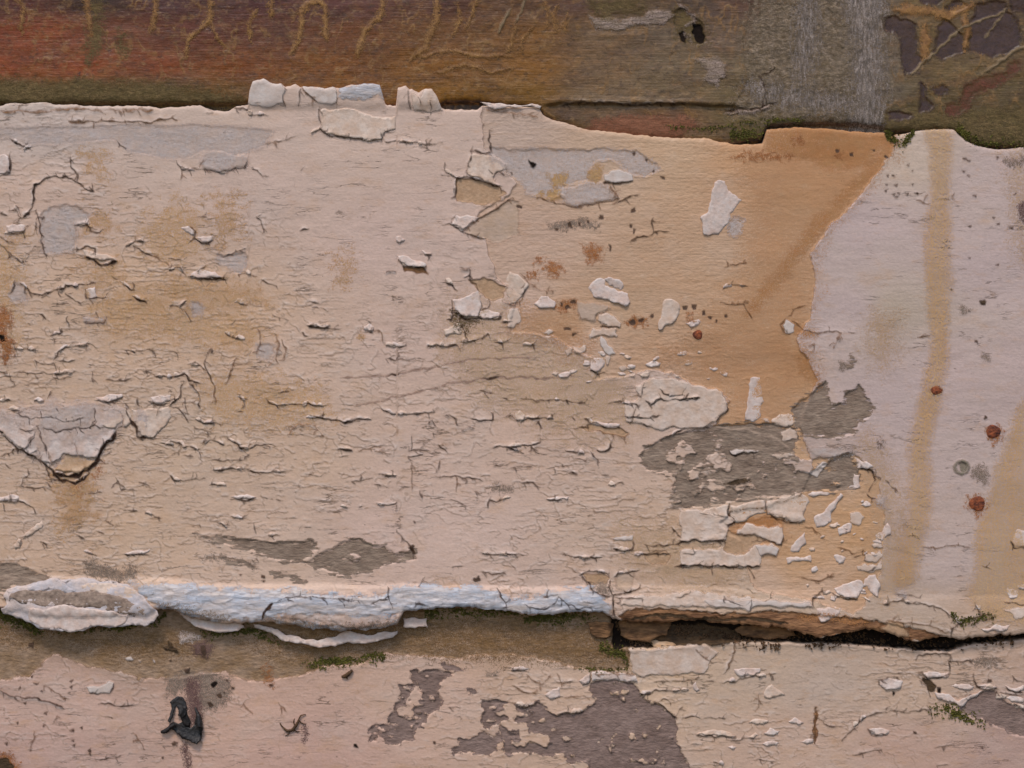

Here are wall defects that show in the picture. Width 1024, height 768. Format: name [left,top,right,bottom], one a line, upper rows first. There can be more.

crack [0,158,612,554]
crack [619,391,657,419]
peeling [0,102,940,768]
crack [457,552,524,582]
crack [883,600,994,633]
peeling [982,584,1024,632]